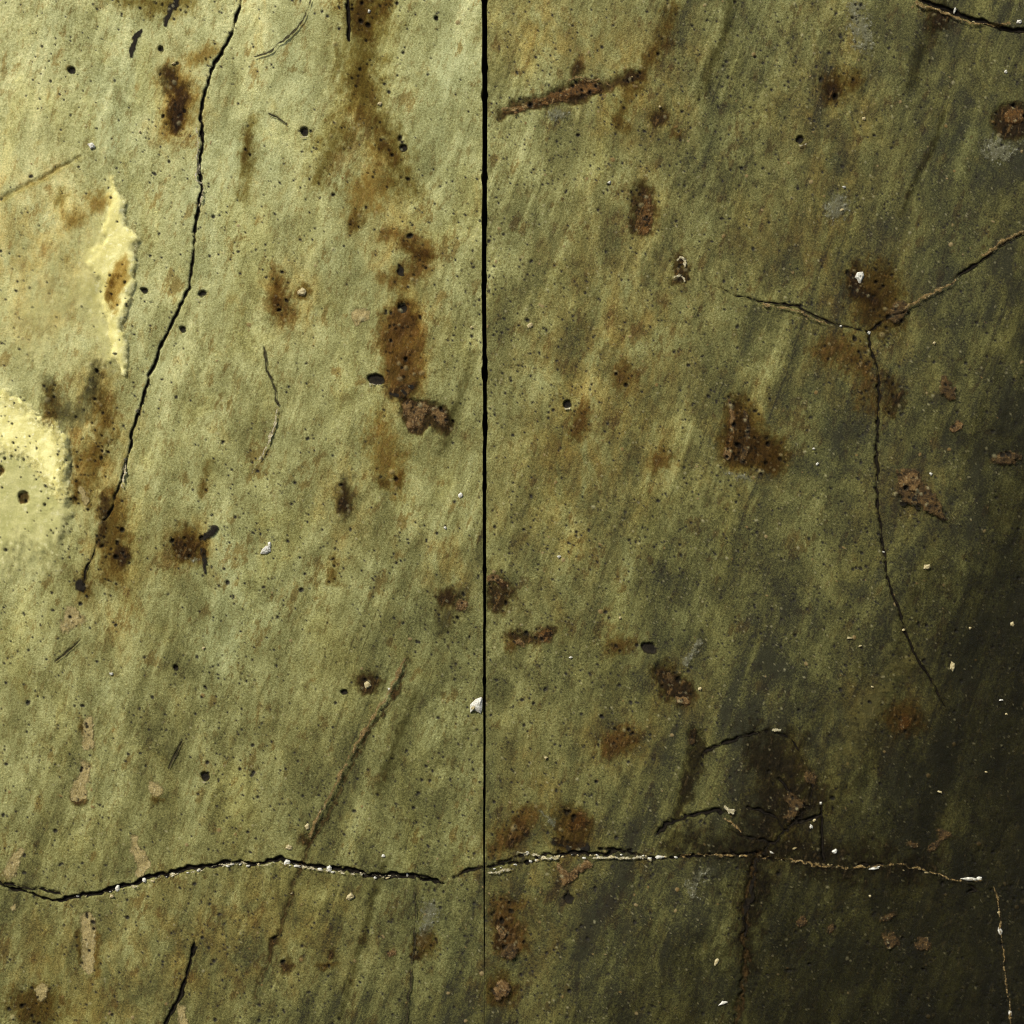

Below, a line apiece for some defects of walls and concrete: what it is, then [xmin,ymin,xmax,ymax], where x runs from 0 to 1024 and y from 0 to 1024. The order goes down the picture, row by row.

rust [165,73,187,131]
crack [915,0,1024,33]
crack [83,3,241,585]
rust [389,382,416,399]
crack [718,230,1024,706]
crack [0,657,1012,1024]